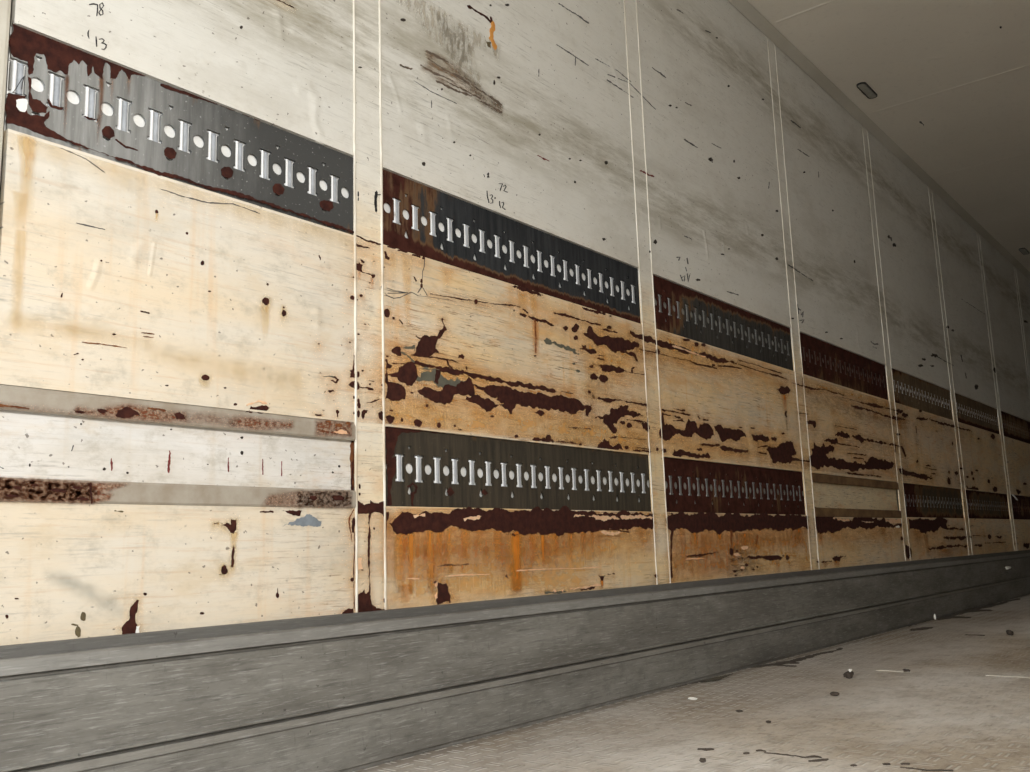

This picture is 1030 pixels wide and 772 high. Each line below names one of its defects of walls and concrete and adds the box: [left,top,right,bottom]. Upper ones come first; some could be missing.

rust [467,5,497,50]
rust [5,23,425,283]
peeling [544,338,580,373]
rust [74,405,217,422]
rust [231,400,292,429]
rust [267,307,1006,614]
rust [0,478,124,512]